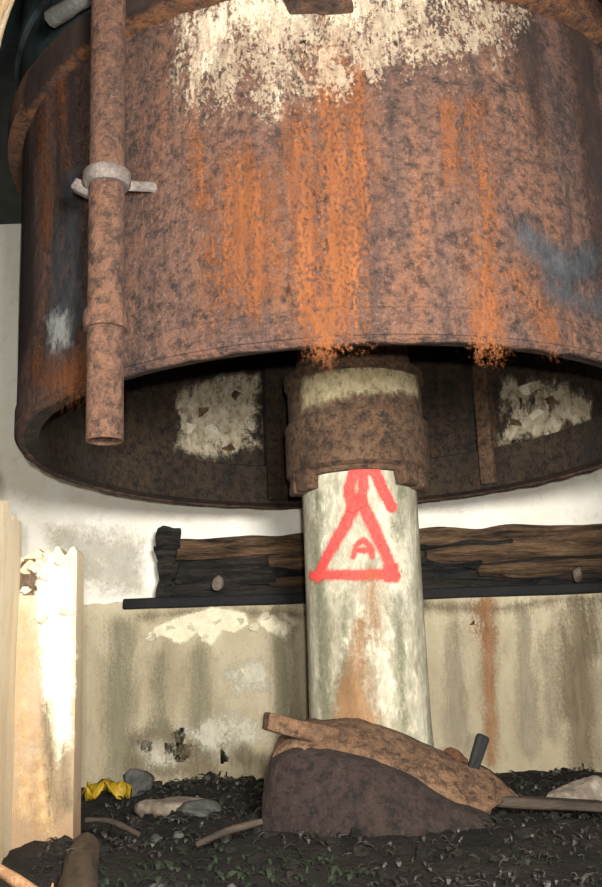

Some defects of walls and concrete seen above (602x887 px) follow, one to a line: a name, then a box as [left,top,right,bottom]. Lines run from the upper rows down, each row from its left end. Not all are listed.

water stain [316,0,427,61]
water stain [514,15,543,133]
corrosion [191,135,279,327]
corrosion [289,33,372,356]
corrosion [467,100,559,353]
corrosion [29,337,87,398]
water stain [107,621,269,782]
water stain [224,638,292,718]
water stain [315,534,330,720]
corrosion [264,573,520,814]
water stain [394,596,405,701]
water stain [493,598,597,771]